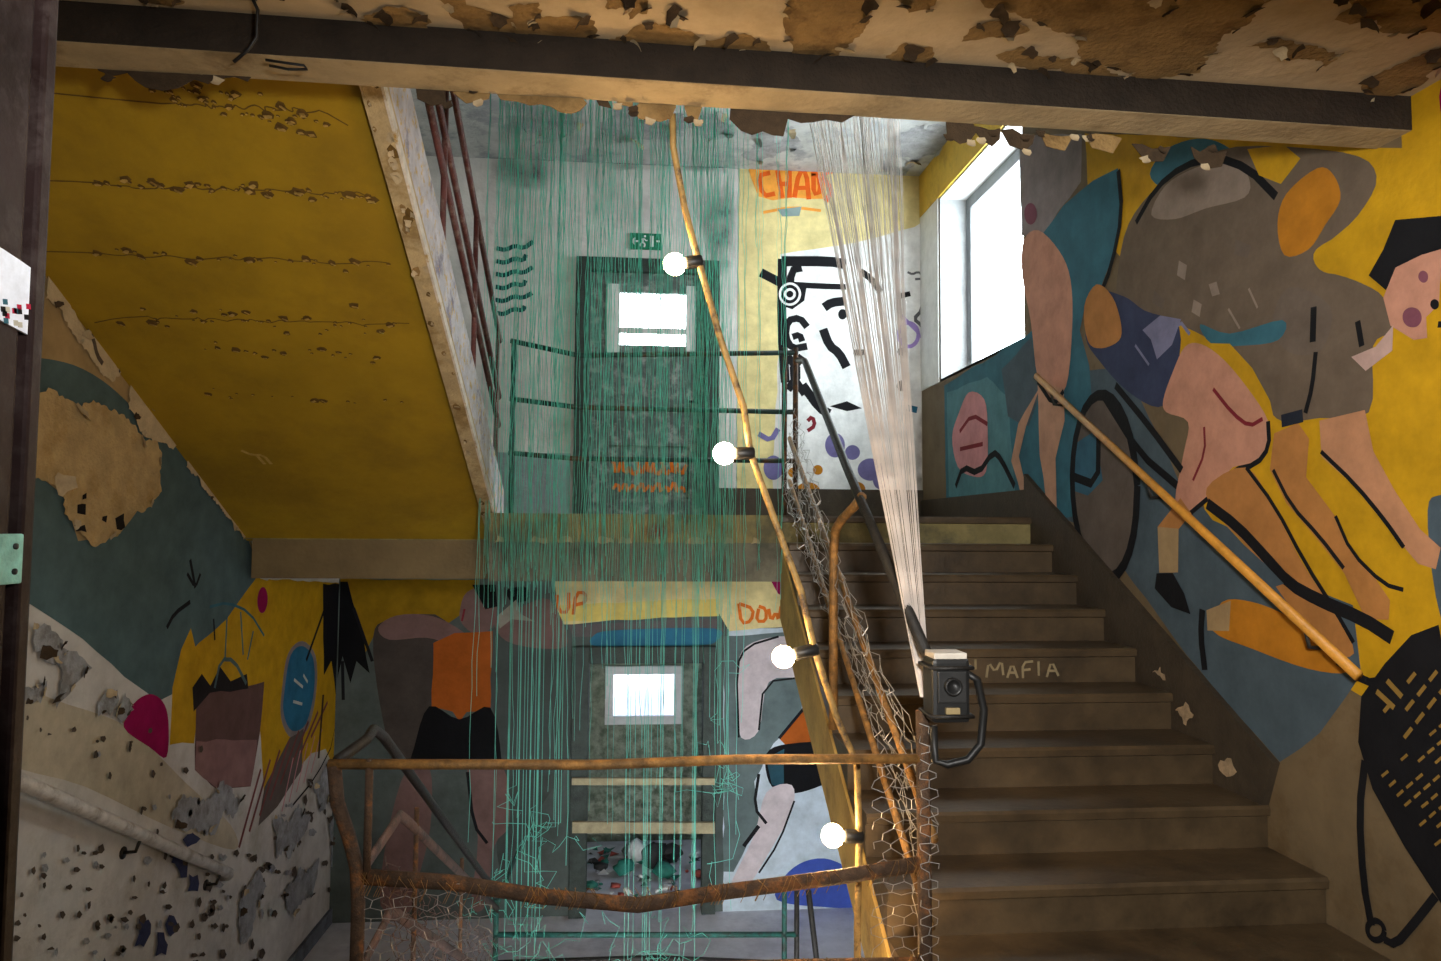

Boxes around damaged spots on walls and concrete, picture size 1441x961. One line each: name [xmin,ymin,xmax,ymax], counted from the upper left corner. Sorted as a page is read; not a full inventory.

peeling [335,0,879,64]
peeling [886,43,938,68]
peeling [896,0,937,13]
peeling [961,0,1271,83]
peeling [1246,37,1352,72]
peeling [54,69,348,138]
flaking render [36,276,409,547]
peeling [25,622,92,735]
peeling [97,689,134,723]
peeling [31,763,335,961]
spalling [14,892,58,957]